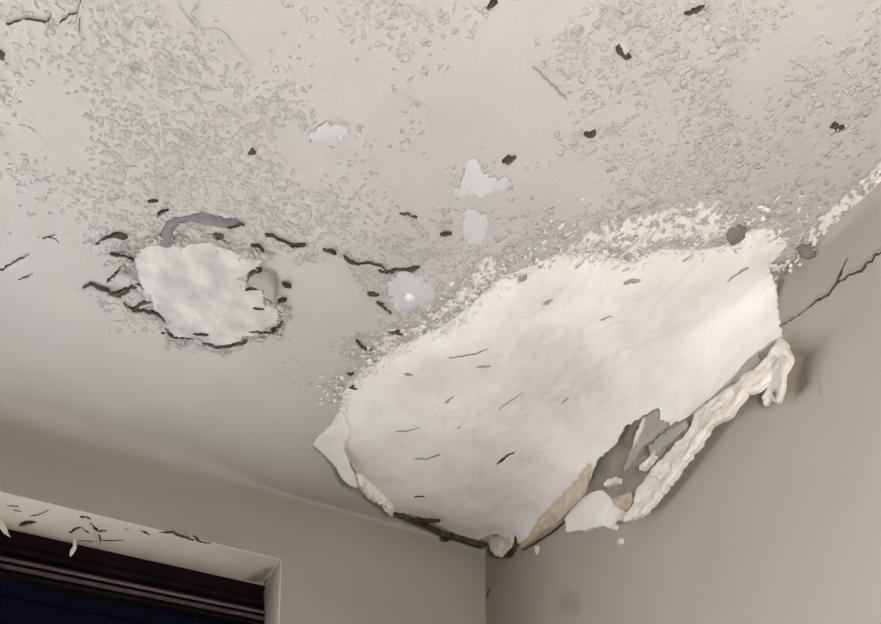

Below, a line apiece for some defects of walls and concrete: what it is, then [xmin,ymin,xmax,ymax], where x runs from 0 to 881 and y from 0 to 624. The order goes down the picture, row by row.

crack [6,0,85,30]
crack [533,66,567,100]
peeling [0,0,881,406]
crack [0,233,59,283]
crack [779,247,881,327]
flaking render [312,200,795,559]